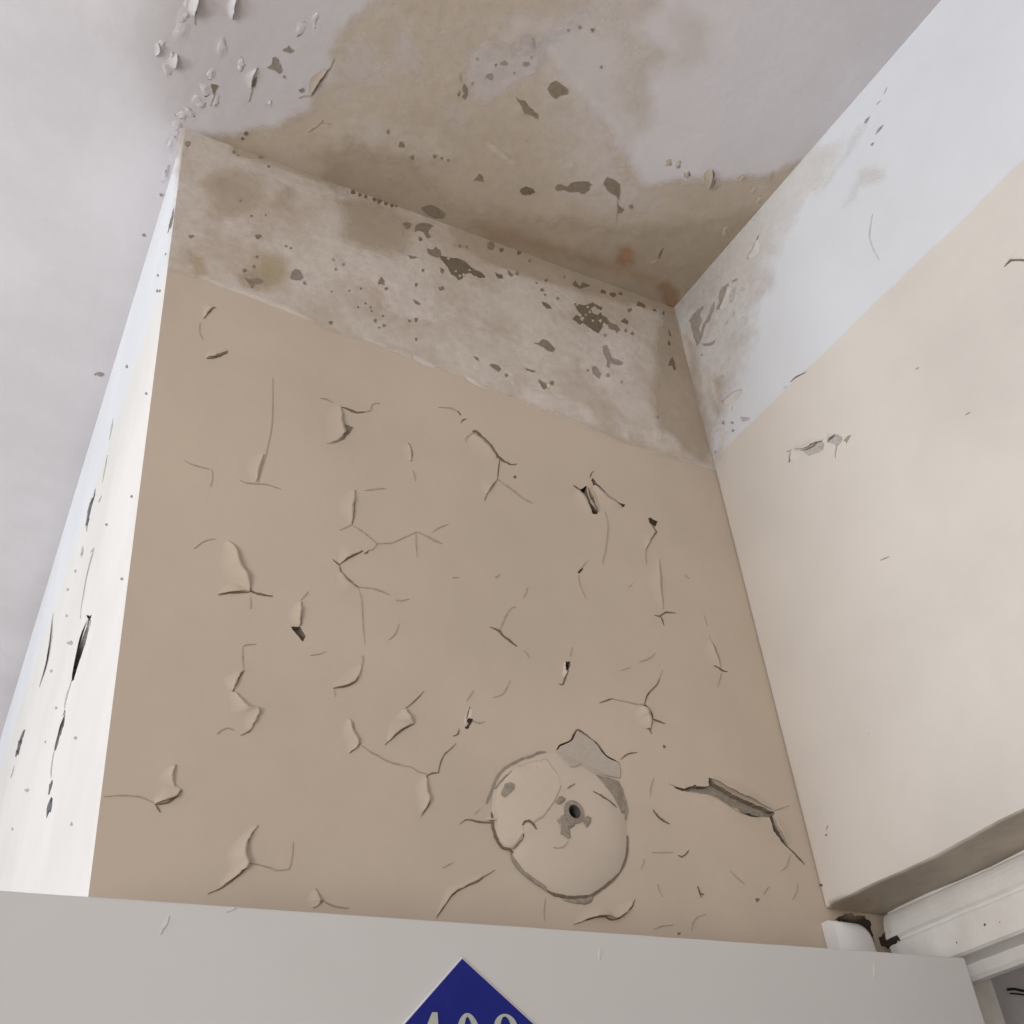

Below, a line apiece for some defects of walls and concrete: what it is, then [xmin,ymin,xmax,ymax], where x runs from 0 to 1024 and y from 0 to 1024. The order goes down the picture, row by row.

peeling [244,46,294,102]
spalling [548,81,568,99]
spalling [402,205,519,305]
damp [170,0,799,468]
spalling [563,276,671,383]
crack [438,407,533,504]
crack [628,517,690,625]
peeling [35,613,68,687]
crack [331,488,448,774]
crack [490,587,529,658]
crack [513,819,568,850]
peeling [670,773,805,871]